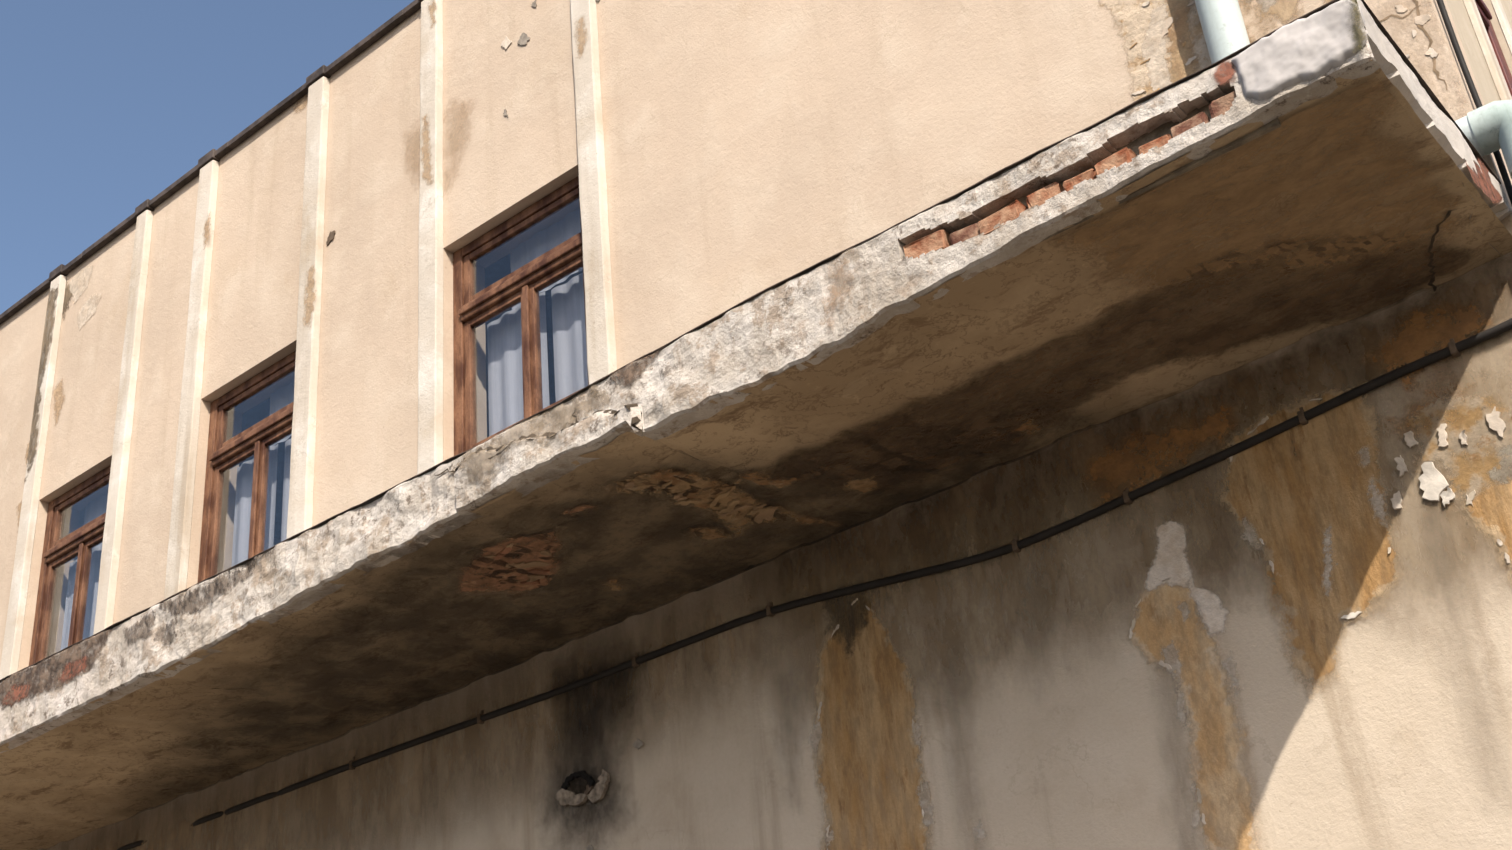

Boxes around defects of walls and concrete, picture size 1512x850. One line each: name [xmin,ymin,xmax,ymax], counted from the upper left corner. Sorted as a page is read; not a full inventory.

flaking render [903,0,1237,259]
flaking render [1118,118,1281,204]
leakage [24,281,73,482]
leakage [771,80,1512,691]
flaking render [0,628,113,710]
leakage [124,545,276,646]
leakage [84,571,767,850]
spalling [555,769,610,806]
peeling [1129,521,1259,850]
peeling [1219,388,1512,689]